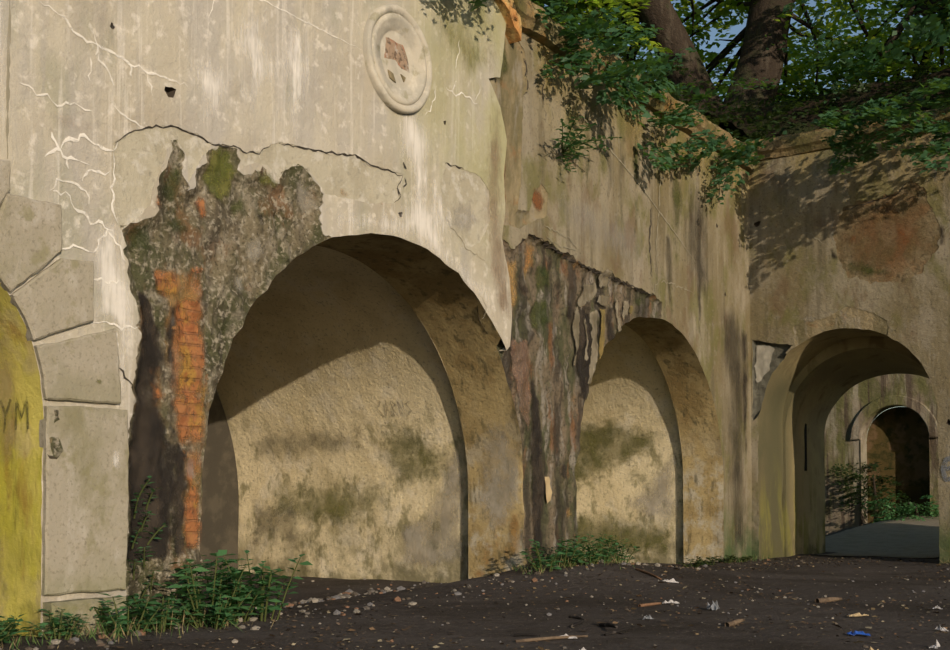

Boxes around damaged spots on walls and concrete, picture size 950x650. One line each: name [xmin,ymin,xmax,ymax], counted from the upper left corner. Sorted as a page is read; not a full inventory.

crack [20,2,188,285]
flaking render [440,163,490,249]
crack [91,321,137,393]
spalling [112,124,402,628]
spalling [495,36,662,567]
spalling [752,306,889,421]
water stain [404,458,461,564]